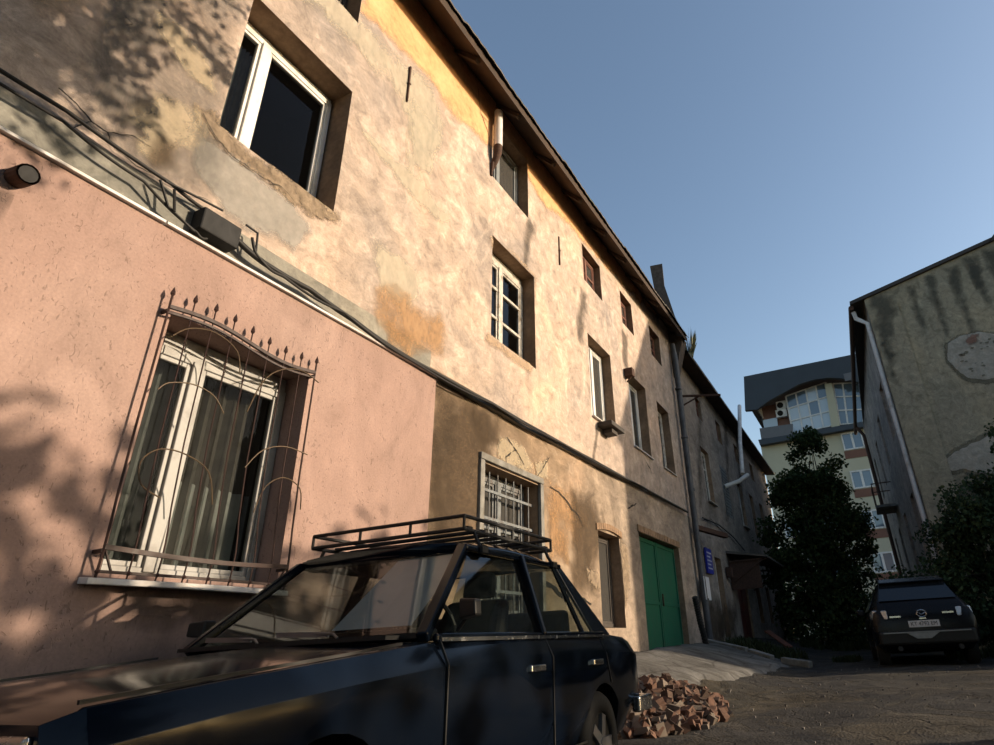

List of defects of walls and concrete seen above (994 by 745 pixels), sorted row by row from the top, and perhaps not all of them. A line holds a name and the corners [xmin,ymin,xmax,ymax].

spalling [194,104,341,221]
peeling [314,0,657,316]
damp [950,251,994,323]
damp [871,296,896,360]
spalling [945,331,994,384]